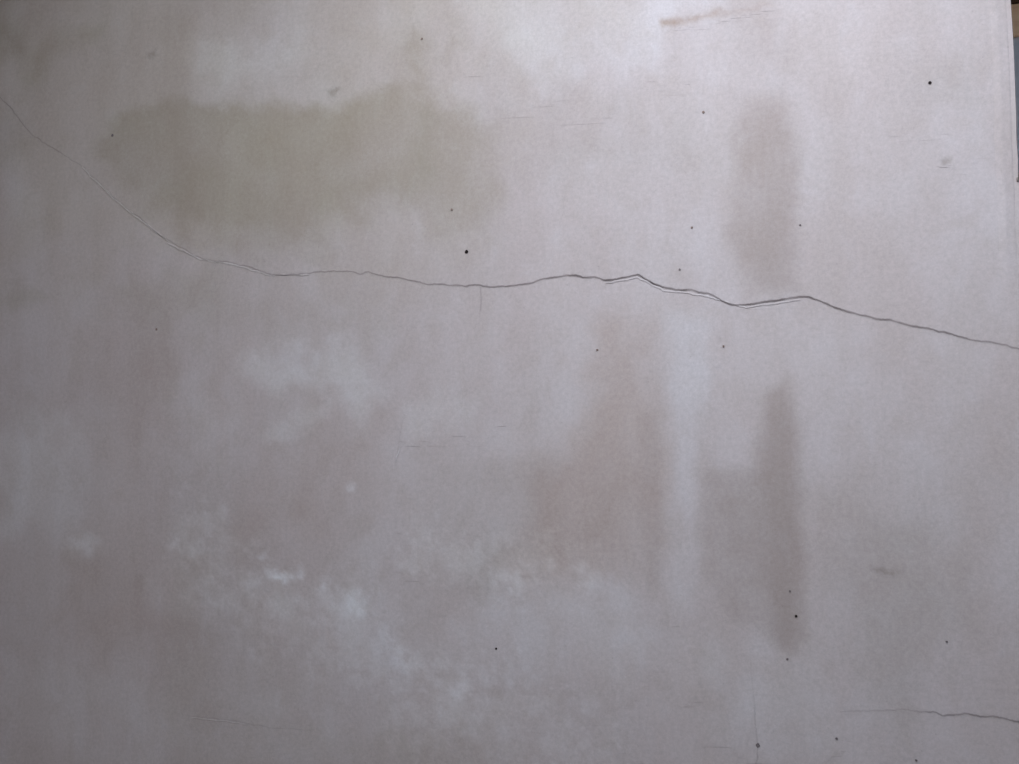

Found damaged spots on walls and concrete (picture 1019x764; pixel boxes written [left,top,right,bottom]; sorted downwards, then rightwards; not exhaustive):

crack [81,166,309,276]
leakage [0,0,820,386]
crack [551,274,843,310]
leakage [0,252,1019,764]